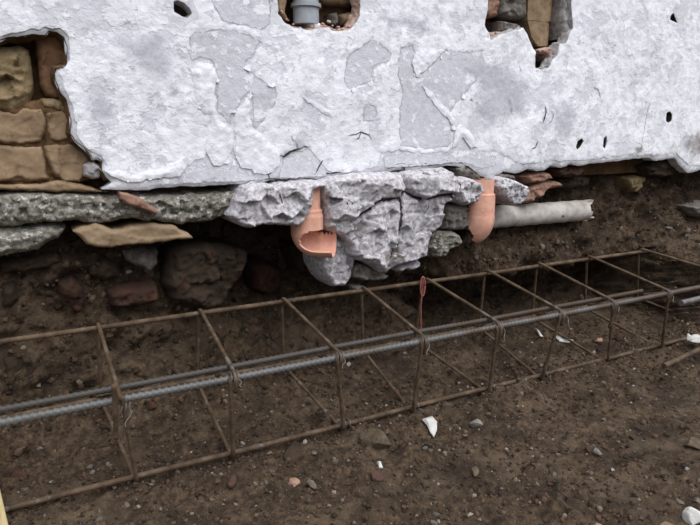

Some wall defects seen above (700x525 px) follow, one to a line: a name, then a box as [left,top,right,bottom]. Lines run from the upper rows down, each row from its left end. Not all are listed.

flaking render [280,0,360,31]
flaking render [538,0,573,70]
peeling [0,0,326,185]
crack [280,137,307,157]